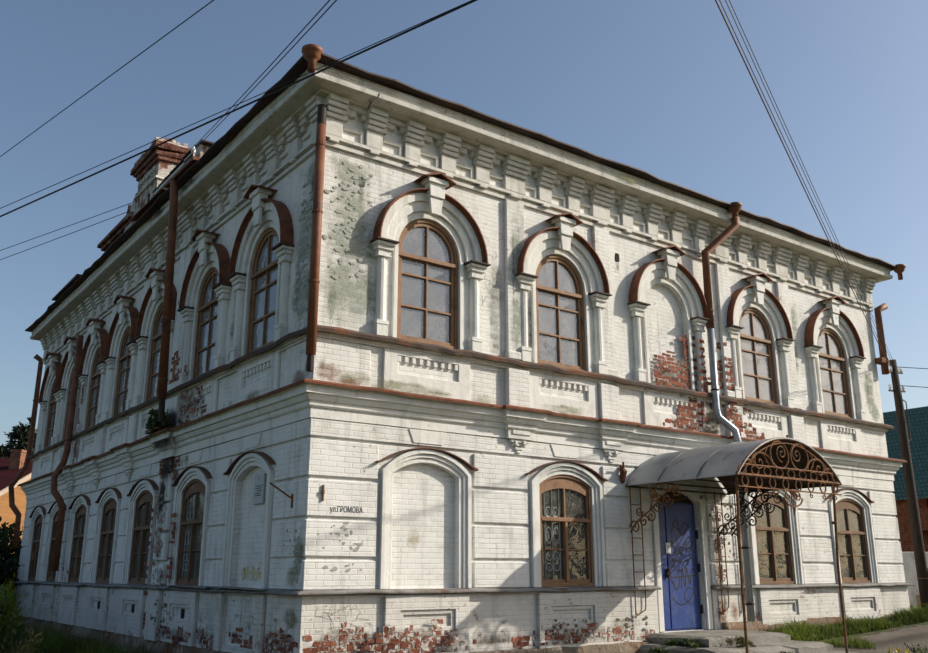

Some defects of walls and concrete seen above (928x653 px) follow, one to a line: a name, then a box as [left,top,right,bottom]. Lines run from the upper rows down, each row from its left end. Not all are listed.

flaking render [169,351,188,384]
flaking render [653,334,765,440]
flaking render [143,455,214,650]
flaking render [228,619,477,653]
flaking render [512,616,655,649]